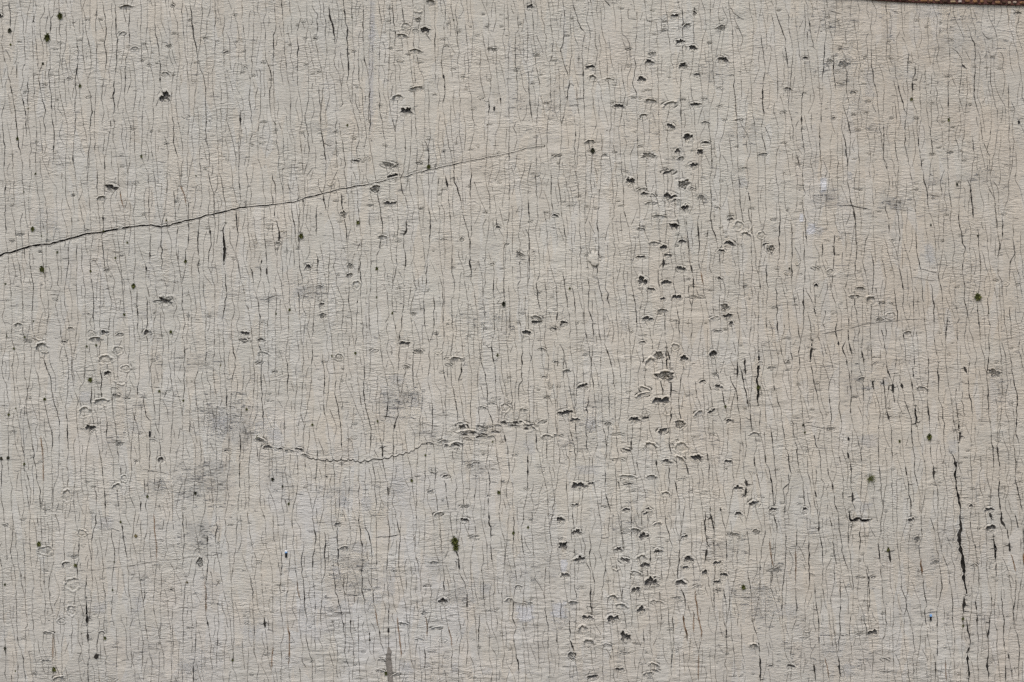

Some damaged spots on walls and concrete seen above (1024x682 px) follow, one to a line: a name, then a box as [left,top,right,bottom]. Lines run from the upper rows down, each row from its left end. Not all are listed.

spalling [395,0,437,63]
hole [636,50,657,84]
spalling [661,9,731,78]
spalling [390,85,425,119]
spalling [603,87,777,487]
crack [403,449,440,524]
crack [539,462,559,557]
crack [0,530,33,598]
spalling [555,480,730,673]
crack [193,632,248,682]
crack [410,644,446,682]
crack [634,601,699,682]